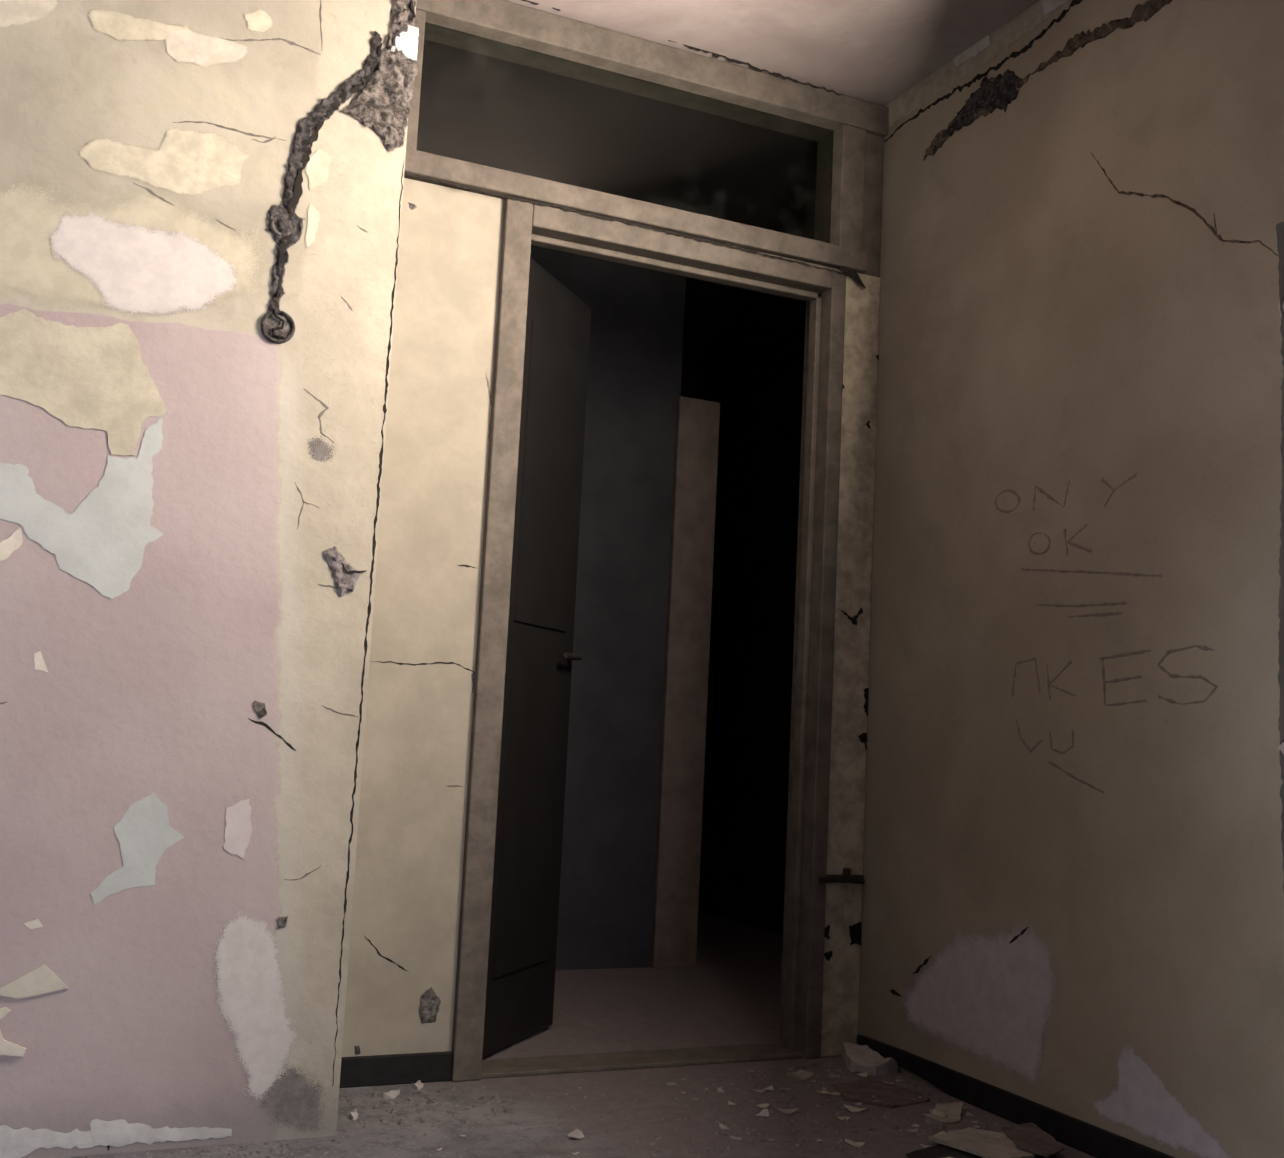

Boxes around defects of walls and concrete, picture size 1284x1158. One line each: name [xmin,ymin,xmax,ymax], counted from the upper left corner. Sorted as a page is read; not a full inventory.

peeling [78,0,250,68]
crack [226,0,323,55]
crack [668,40,841,95]
crack [884,0,1082,142]
crack [134,183,175,206]
peeling [77,128,249,195]
crack [173,121,286,143]
spalling [268,0,419,312]
crack [1091,153,1279,257]
peeling [0,309,166,599]
spalling [320,546,367,597]
peeling [0,1119,232,1158]